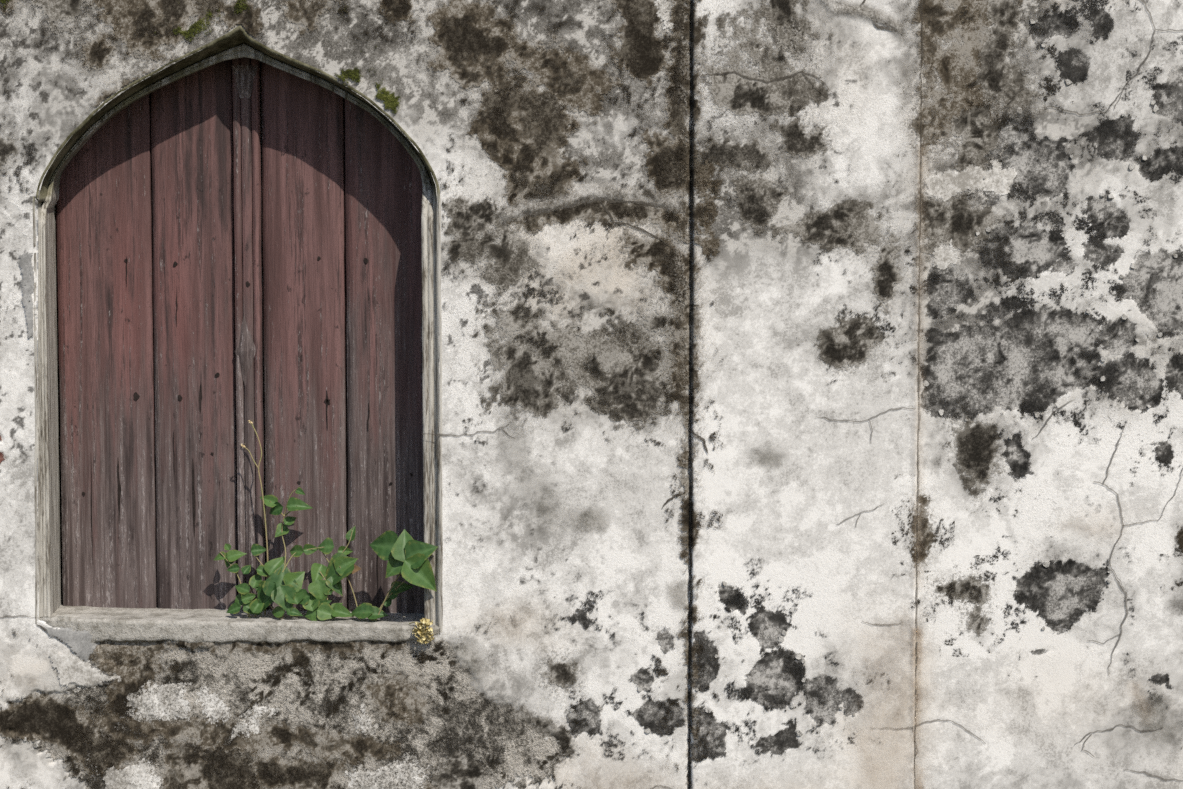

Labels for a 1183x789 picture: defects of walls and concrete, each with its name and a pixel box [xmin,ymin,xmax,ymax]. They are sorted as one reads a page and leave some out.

damp [0,117,37,192]
damp [0,0,263,107]
damp [277,0,349,37]
damp [903,0,1056,172]
crack [1014,0,1183,115]
damp [353,0,1022,770]
crack [1089,424,1183,676]
spalling [6,557,890,789]